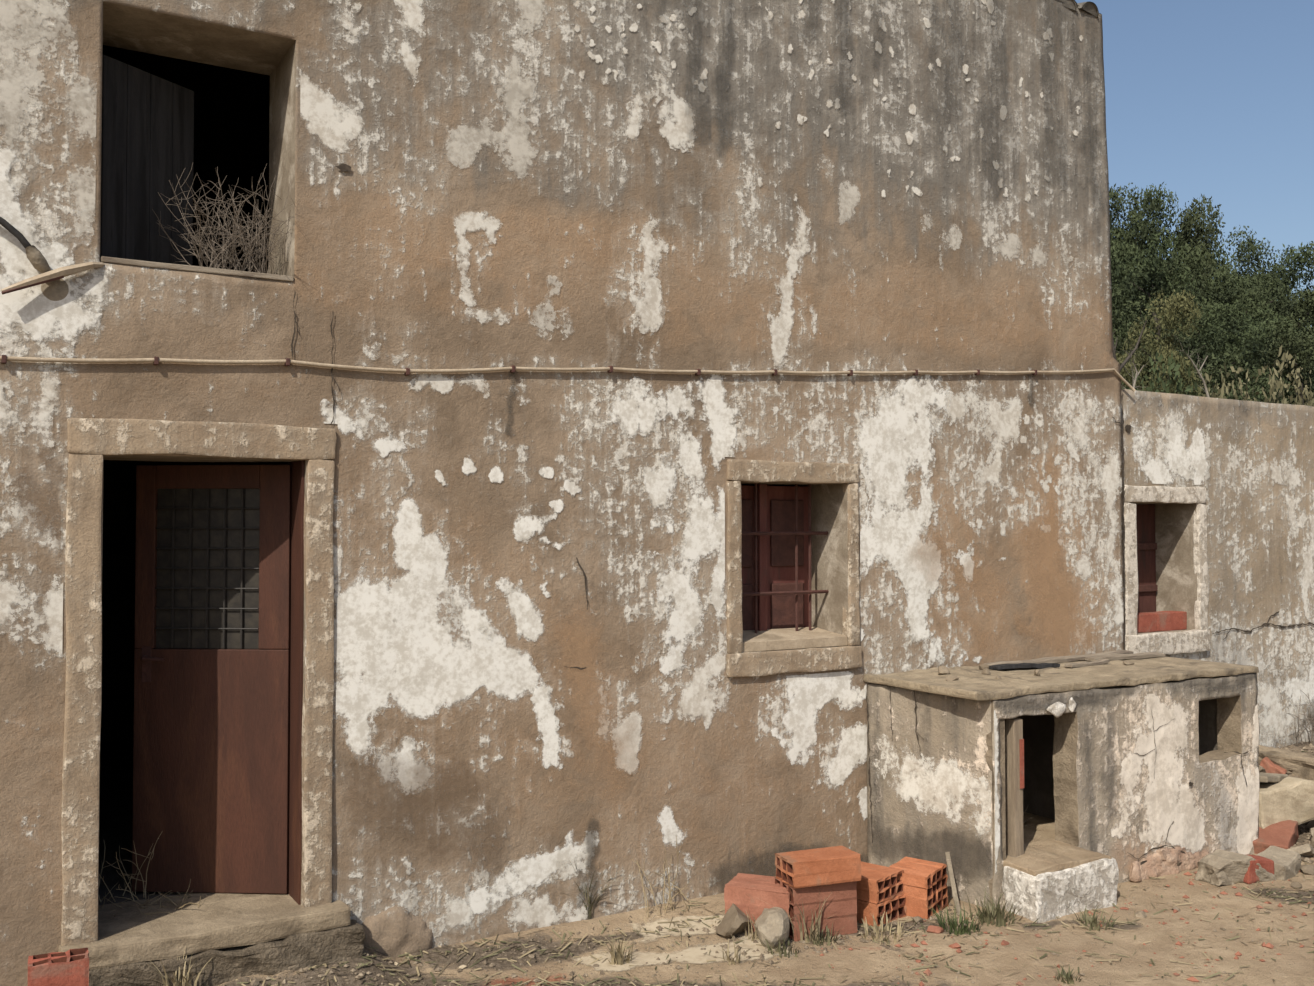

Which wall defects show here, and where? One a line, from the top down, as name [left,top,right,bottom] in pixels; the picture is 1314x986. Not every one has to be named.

peeling [0,0,108,447]
peeling [0,571,63,655]
peeling [336,497,566,795]
peeling [462,458,503,483]
peeling [513,466,581,550]
peeling [598,374,738,774]
peeling [857,374,1208,667]
crack [1212,611,1314,640]
peeling [390,831,599,937]
peeling [771,671,1000,873]
peeling [1111,694,1210,883]
peeling [1234,659,1314,855]